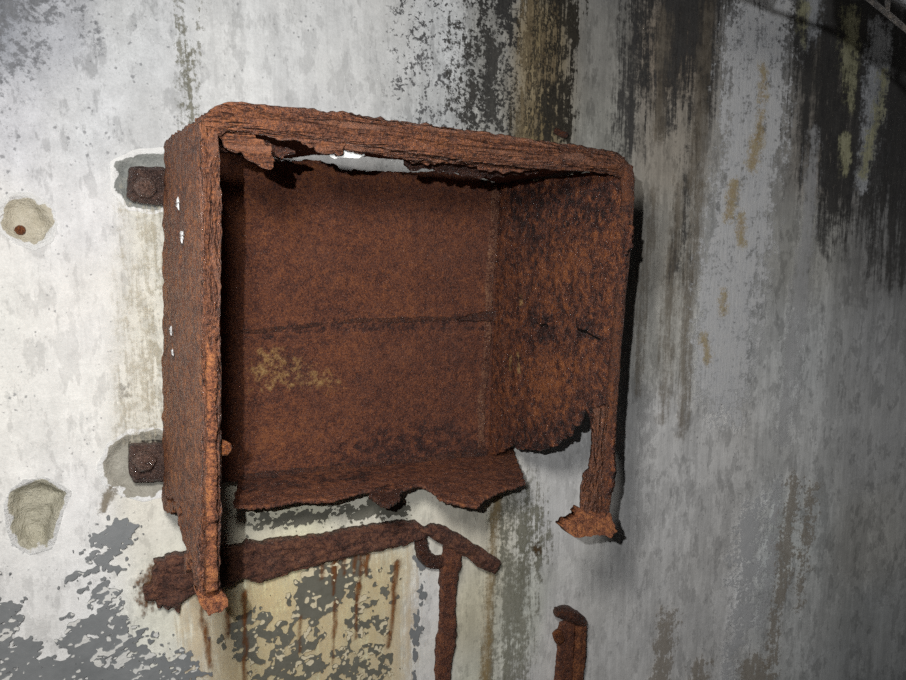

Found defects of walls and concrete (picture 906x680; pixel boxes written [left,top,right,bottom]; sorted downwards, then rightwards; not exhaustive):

water stain [388,0,588,144]
spalling [0,192,57,250]
spalling [110,147,165,215]
water stain [611,0,906,447]
peeling [0,428,213,680]
corrosion [135,564,155,613]
corrosion [200,606,211,665]
peeling [207,555,401,680]
peeling [246,497,411,538]
corrosion [321,553,370,639]
corrosion [387,560,399,648]
corrosion [552,605,587,680]